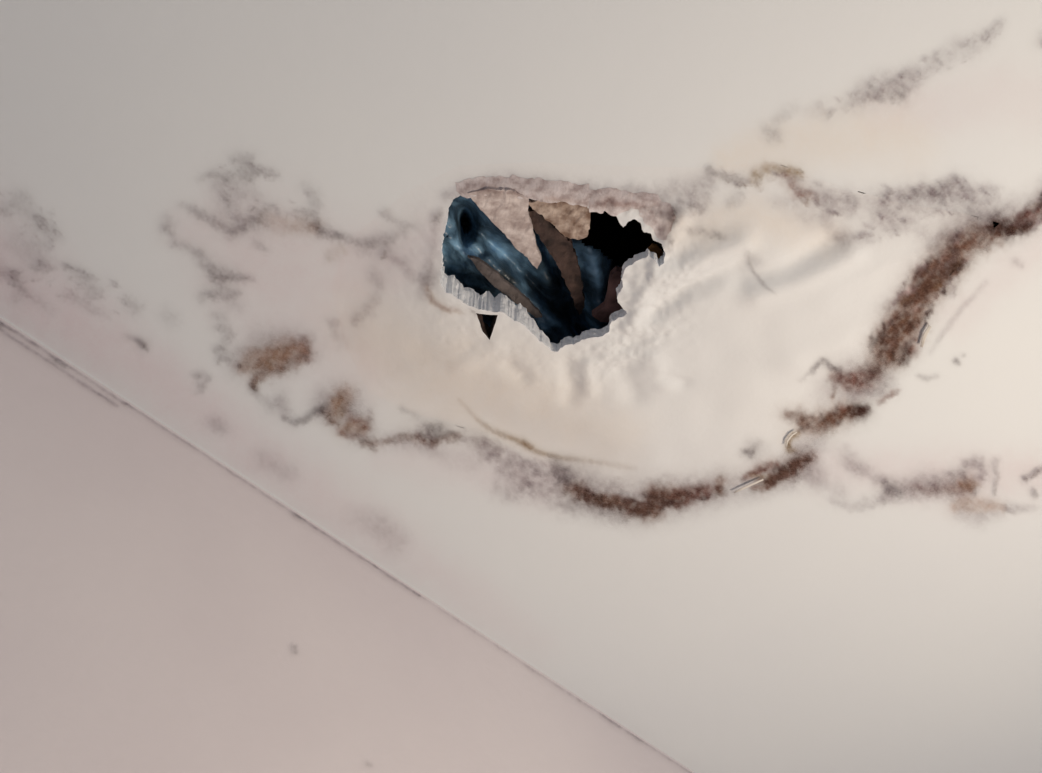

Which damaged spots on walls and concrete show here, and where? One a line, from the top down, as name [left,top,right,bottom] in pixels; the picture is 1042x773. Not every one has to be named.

leakage [835,194,1042,392]
leakage [744,405,870,490]
leakage [564,478,723,518]